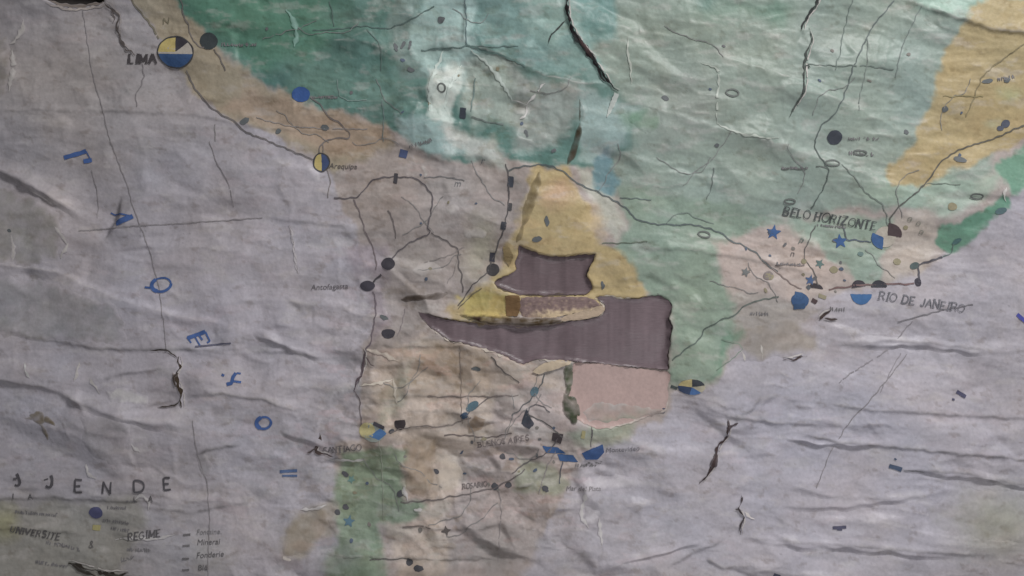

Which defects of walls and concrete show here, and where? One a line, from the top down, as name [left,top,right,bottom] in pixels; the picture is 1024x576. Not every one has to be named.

peeling [419,246,673,429]